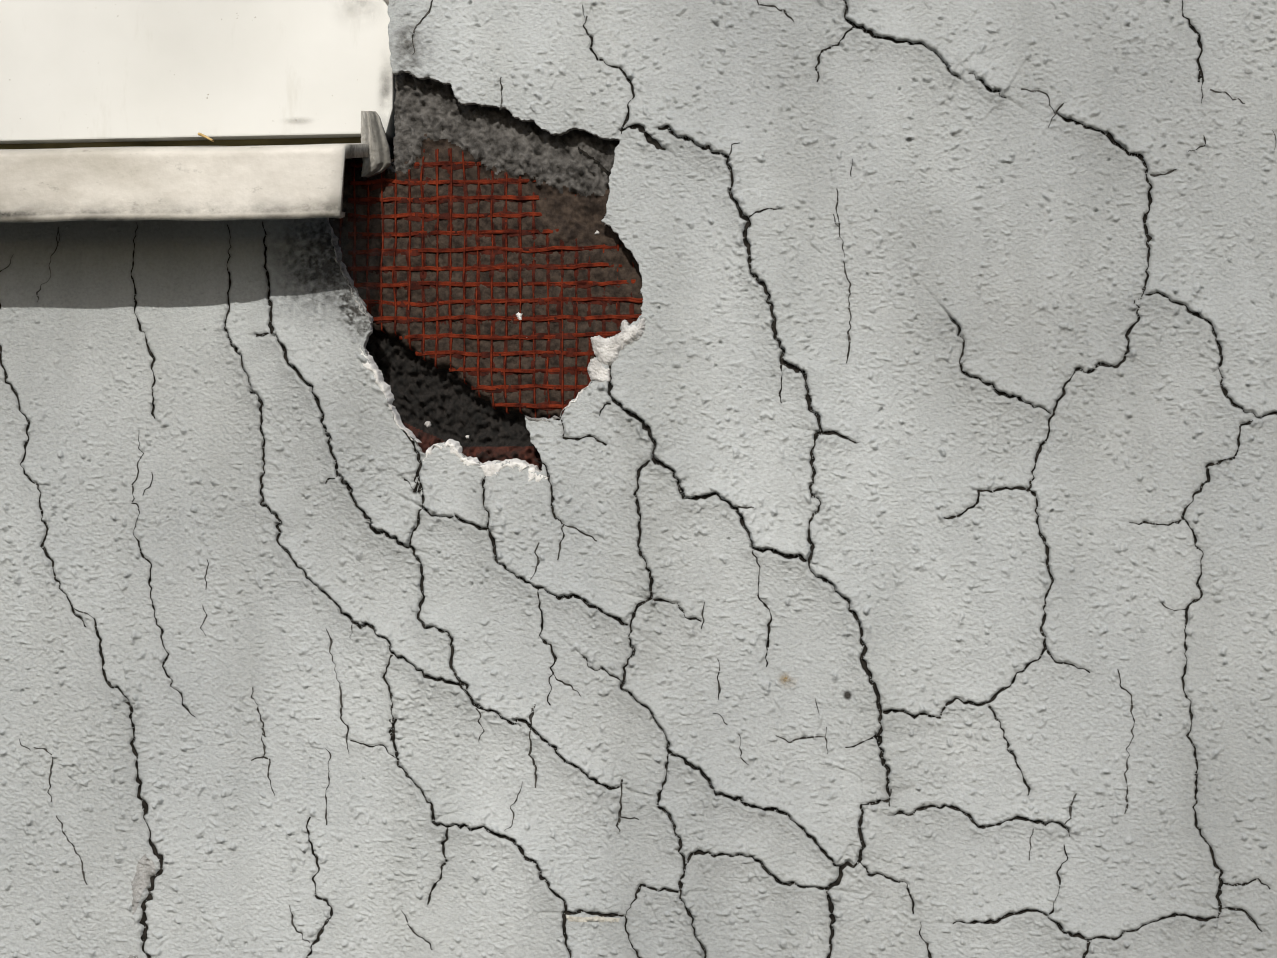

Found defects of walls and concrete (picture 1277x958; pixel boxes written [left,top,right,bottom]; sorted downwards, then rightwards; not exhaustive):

crack [412,0,433,54]
crack [582,5,666,150]
crack [756,0,794,22]
crack [815,0,1007,98]
crack [1182,0,1245,104]
crack [36,227,60,302]
flaking render [329,72,645,482]
crack [131,223,195,717]
crack [224,88,1277,958]
crack [200,560,209,636]
crack [0,345,163,958]